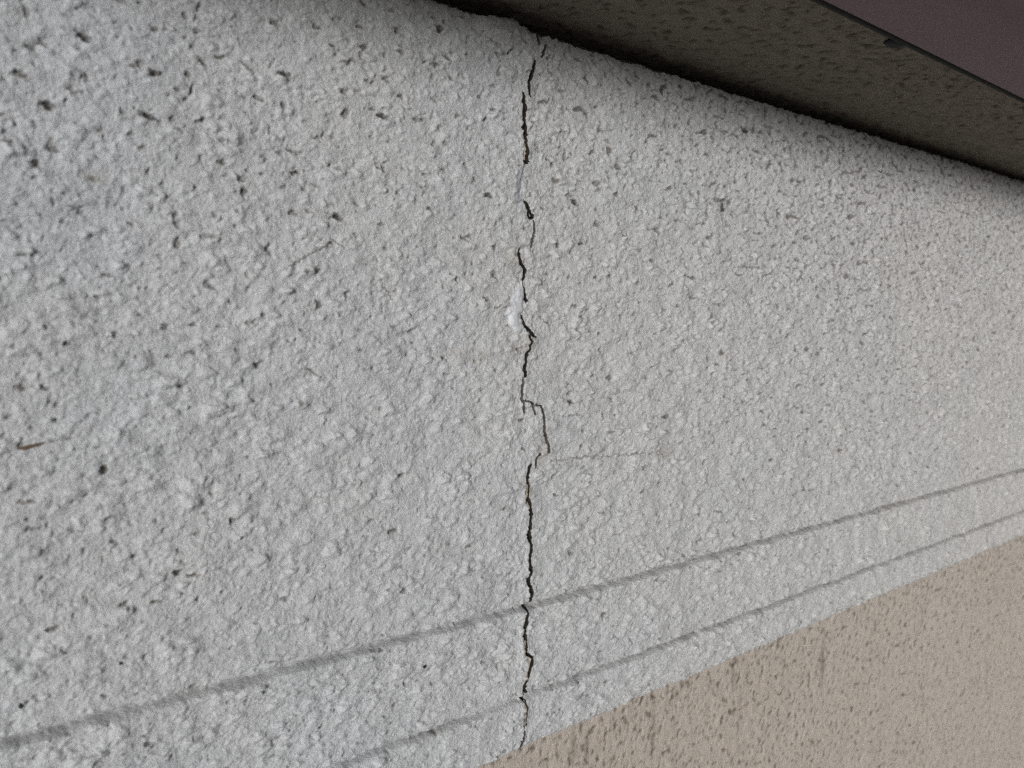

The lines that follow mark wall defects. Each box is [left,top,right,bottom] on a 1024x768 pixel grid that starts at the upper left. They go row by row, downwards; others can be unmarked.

crack [522,33,546,163]
crack [517,200,663,750]